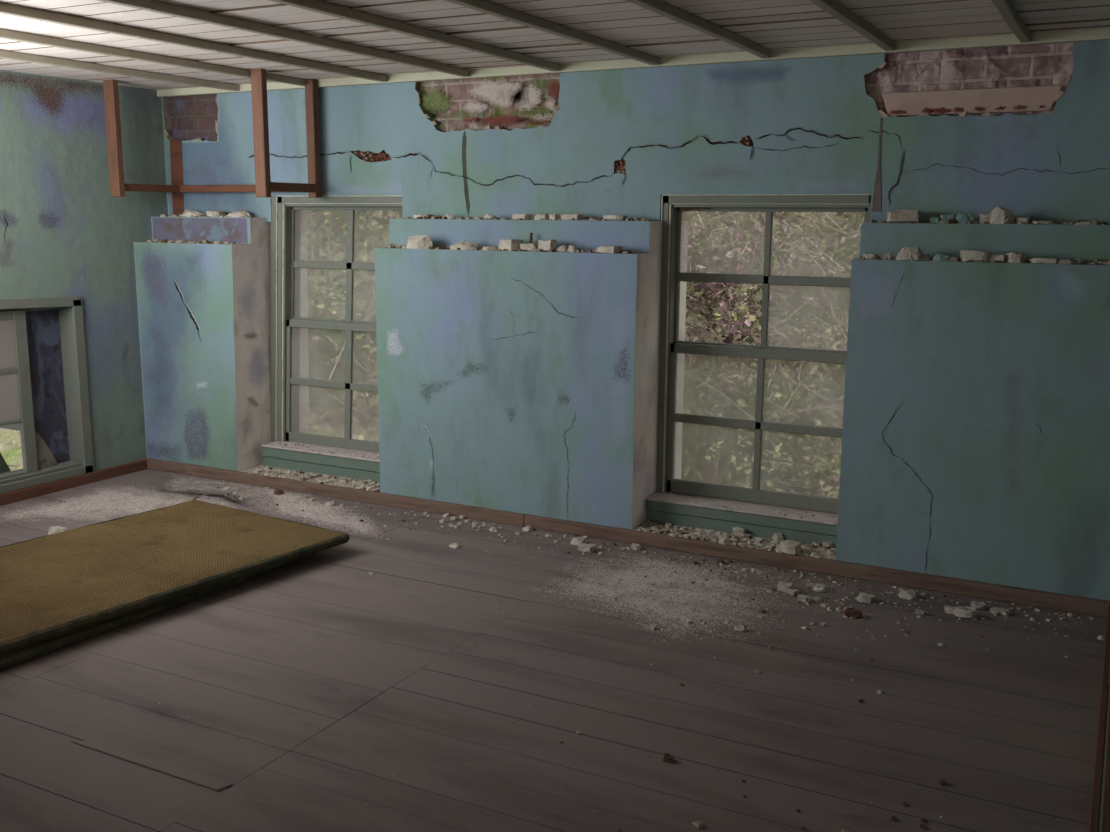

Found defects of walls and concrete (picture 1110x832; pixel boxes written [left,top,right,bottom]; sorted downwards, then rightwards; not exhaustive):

water stain [0,72,109,167]
spalling [162,94,218,141]
spalling [415,73,561,132]
spalling [864,42,1074,118]
crack [248,151,352,172]
crack [390,127,1106,215]
crack [174,281,202,343]
crack [882,410,933,572]